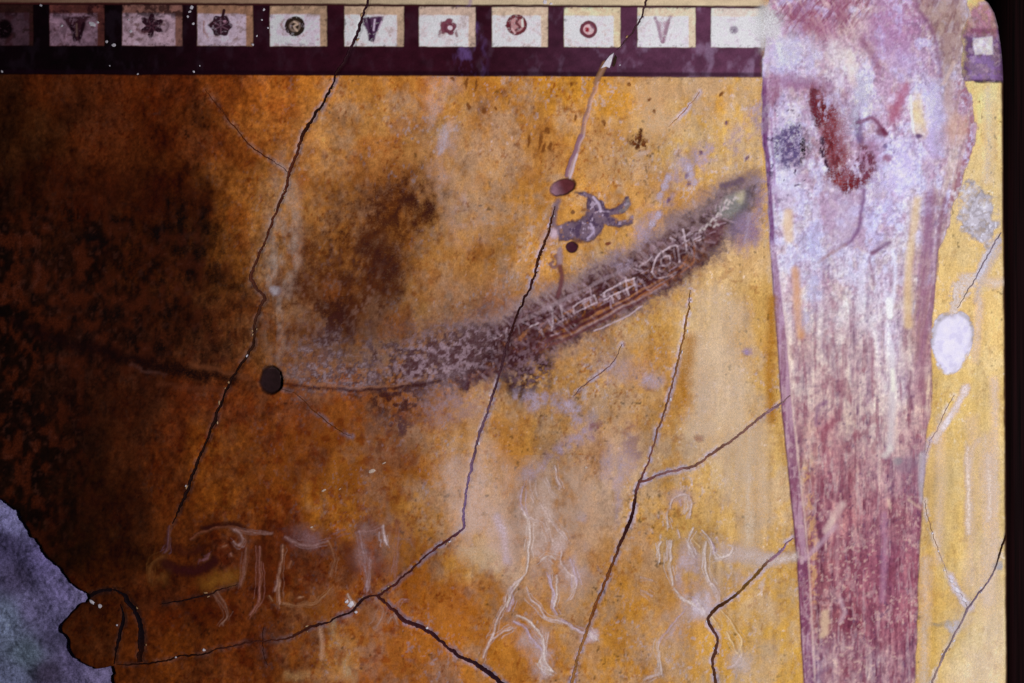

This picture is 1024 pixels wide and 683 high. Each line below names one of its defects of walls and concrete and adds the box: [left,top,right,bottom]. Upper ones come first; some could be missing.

crack [617,0,647,50]
crack [173,0,369,523]
crack [959,233,1001,306]
crack [89,209,555,683]
crack [571,290,793,683]
flaking render [0,499,116,683]
crack [925,500,1006,683]